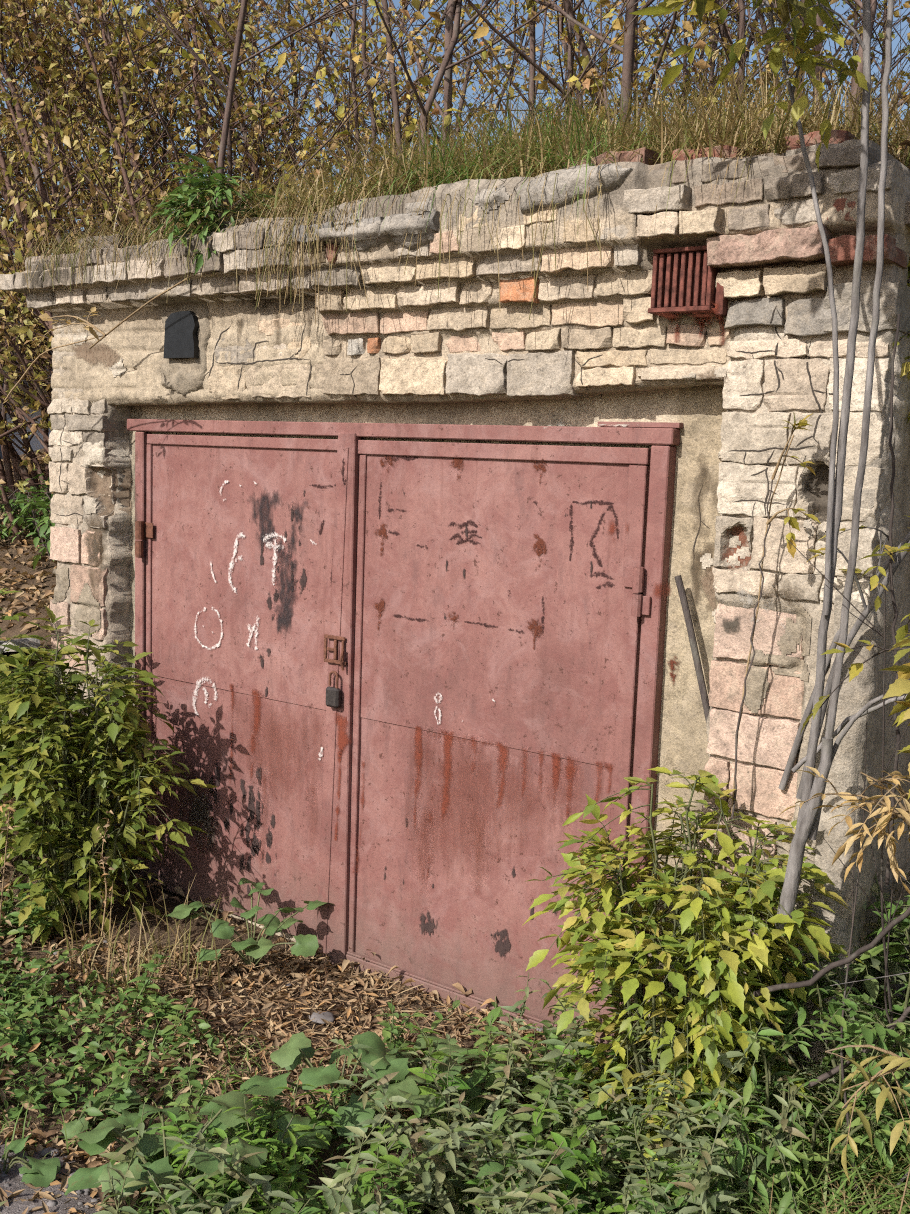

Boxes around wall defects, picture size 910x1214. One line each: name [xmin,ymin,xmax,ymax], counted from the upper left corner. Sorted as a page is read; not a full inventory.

spalling [800,457,836,537]
peeling [260,542,307,620]
rust [533,534,546,556]
spalling [700,526,752,633]
rust [527,619,542,649]
spalling [744,605,812,714]
rust [251,690,260,751]
rust [334,715,349,840]
rust [442,732,453,815]
rust [540,752,573,816]
peeling [208,762,276,894]
peeling [490,929,511,957]